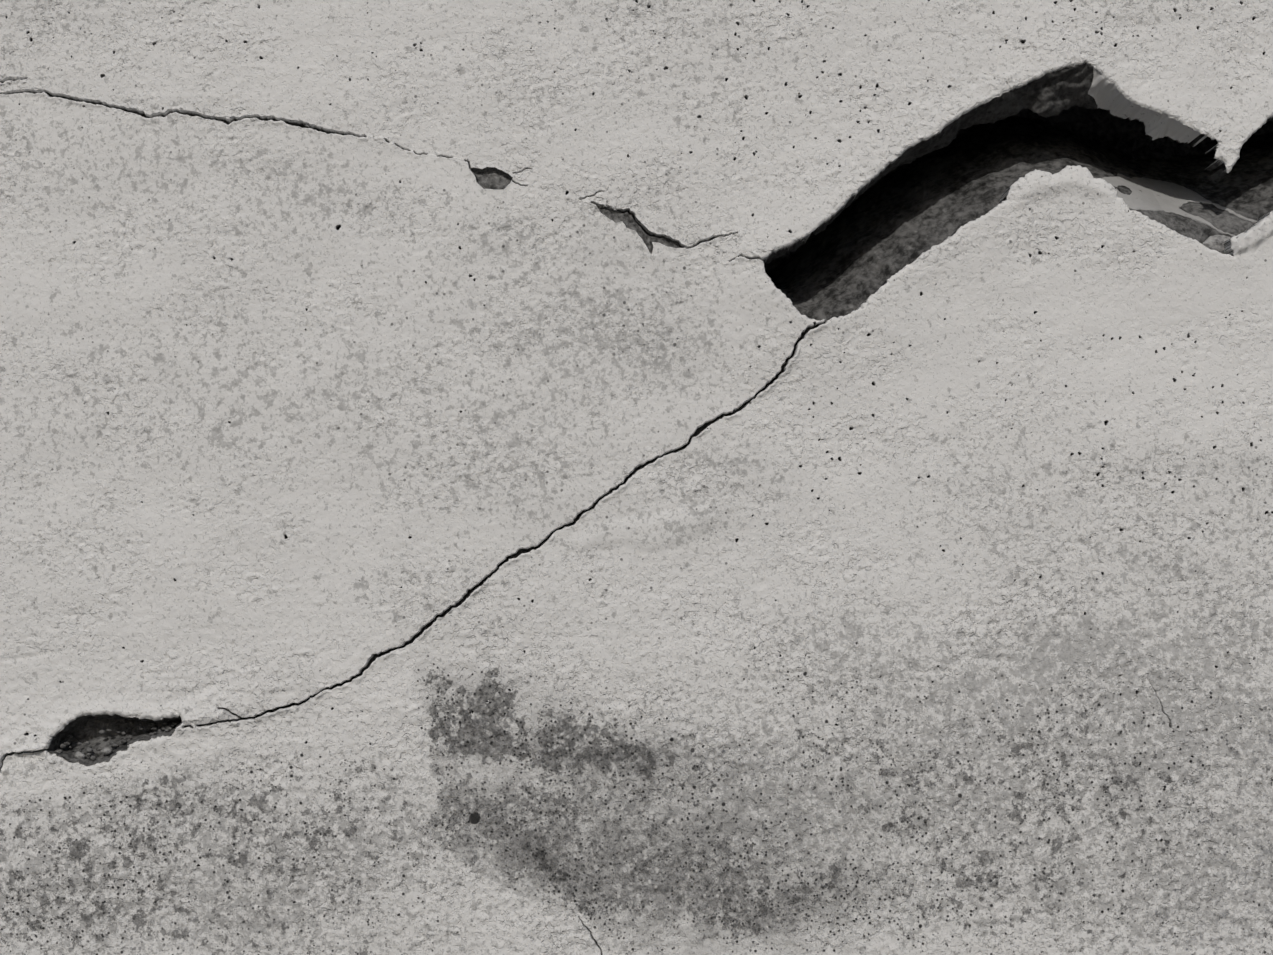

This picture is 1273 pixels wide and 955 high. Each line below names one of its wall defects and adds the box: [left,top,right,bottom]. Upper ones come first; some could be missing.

crack [0,77,471,174]
crack [511,167,533,187]
crack [579,190,605,200]
flaking render [763,63,1273,326]
crack [687,231,764,262]
crack [180,317,836,733]
crack [0,746,48,772]
flaking render [38,707,188,774]
damp [415,655,724,792]
damp [469,812,480,824]
damp [490,823,611,931]